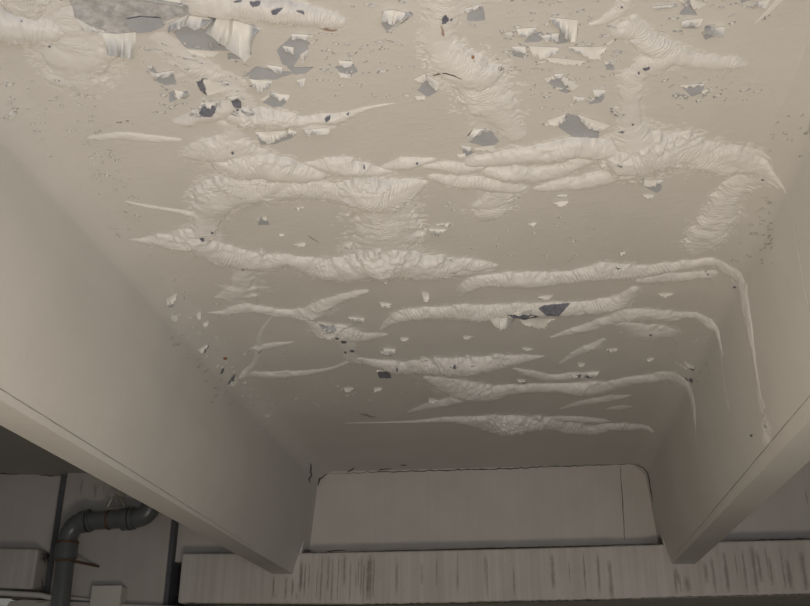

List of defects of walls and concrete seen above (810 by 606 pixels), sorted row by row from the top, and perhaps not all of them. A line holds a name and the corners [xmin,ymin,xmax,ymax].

peeling [381,10,414,31]
peeling [464,4,485,27]
peeling [70,0,314,117]
peeling [336,60,358,78]
peeling [499,1,622,138]
peeling [414,73,439,100]
peeling [661,71,733,108]
peeling [255,127,330,145]
peeling [457,128,499,158]
crack [0,388,249,545]